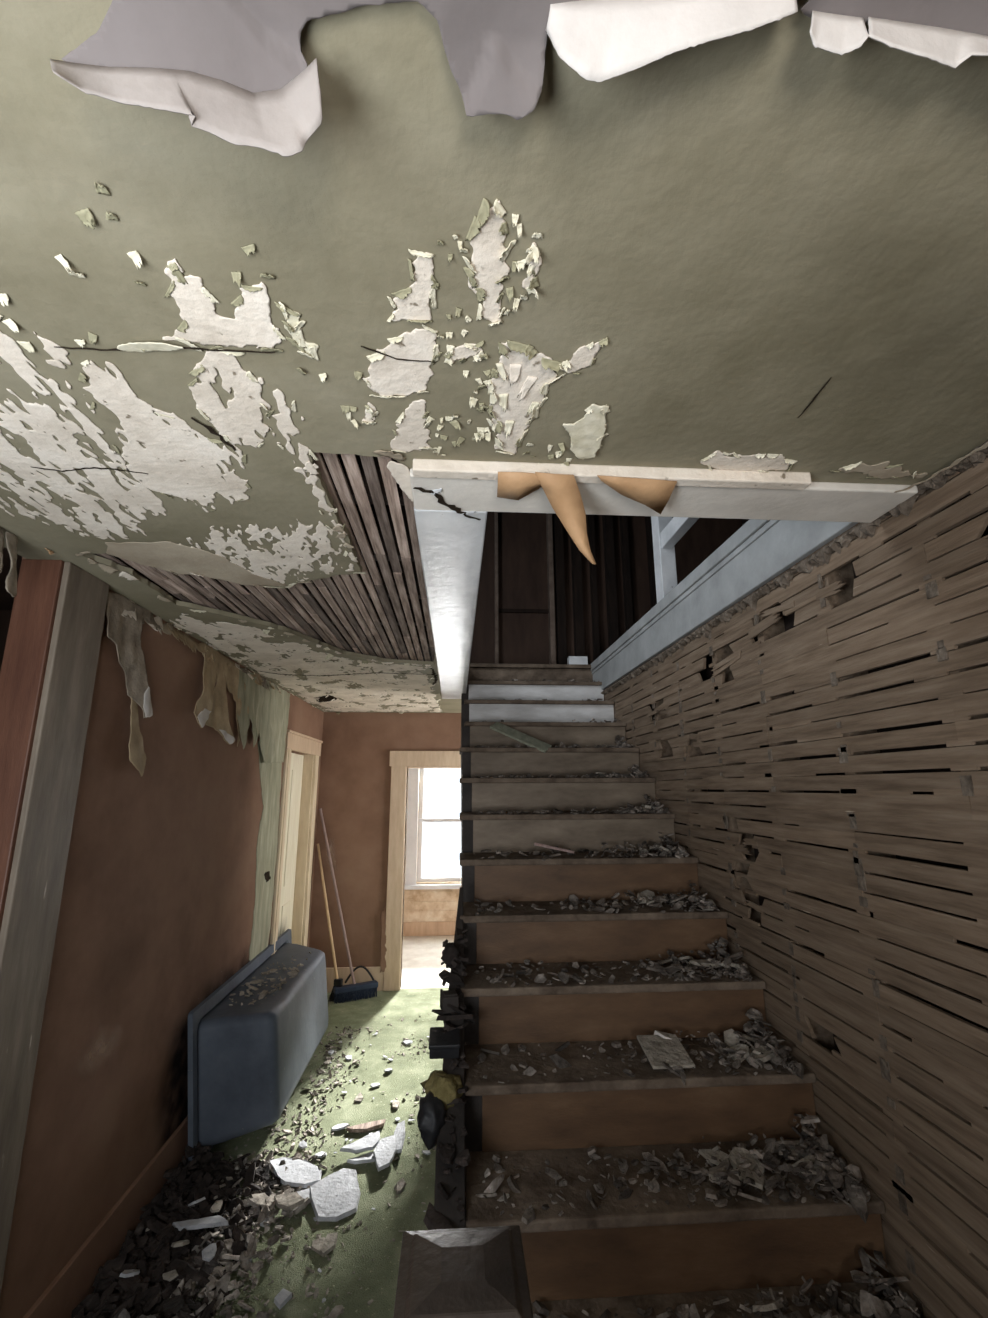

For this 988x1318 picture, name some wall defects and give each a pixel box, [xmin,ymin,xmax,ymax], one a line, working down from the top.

peeling [54,254,86,279]
peeling [126,250,147,286]
peeling [241,243,255,257]
peeling [340,198,611,502]
crack [798,377,832,418]
peeling [0,258,366,589]
peeling [700,450,798,473]
peeling [830,461,928,479]
crack [413,487,481,520]
flaking render [117,593,443,764]